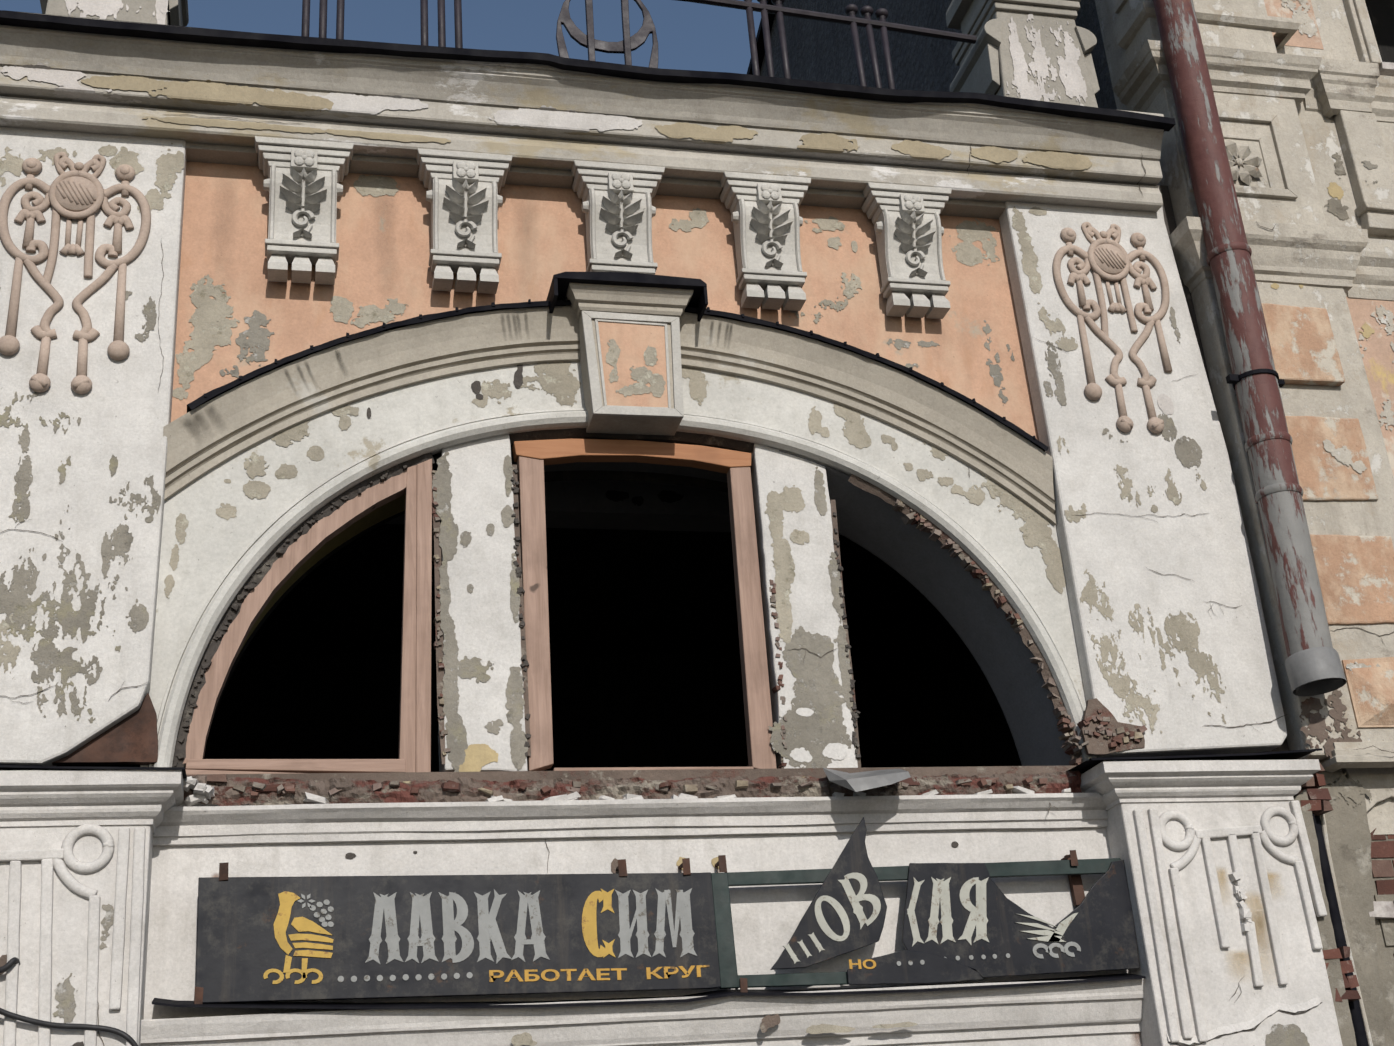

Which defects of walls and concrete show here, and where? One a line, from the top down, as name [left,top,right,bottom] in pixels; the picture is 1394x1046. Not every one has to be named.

peeling [65,0,170,25]
peeling [1006,13,1088,106]
peeling [0,392,81,523]
peeling [172,274,275,400]
peeling [471,362,581,408]
peeling [1113,373,1221,513]
peeling [1169,307,1181,343]
peeling [1359,305,1394,363]
peeling [0,455,161,727]
peeling [164,513,189,599]
flaking render [172,403,1227,807]
spalling [1167,689,1372,1046]